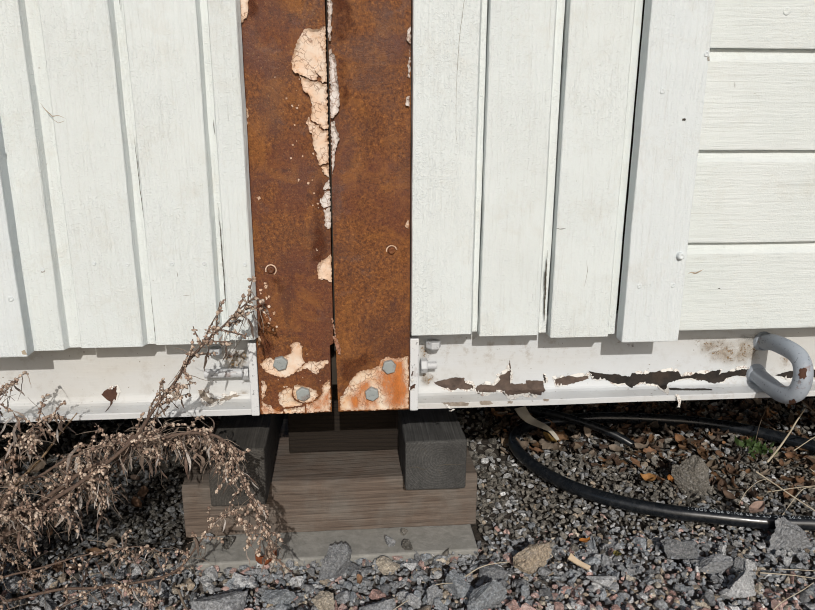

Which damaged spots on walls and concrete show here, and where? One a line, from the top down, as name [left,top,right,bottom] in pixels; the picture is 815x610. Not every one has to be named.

peeling [240,0,248,23]
peeling [291,0,340,229]
peeling [317,254,332,282]
peeling [102,384,121,412]
peeling [260,342,416,414]
rust [351,383,372,408]
rust [379,361,407,405]
peeling [441,402,469,411]
peeling [434,361,750,407]
peeling [776,367,815,380]